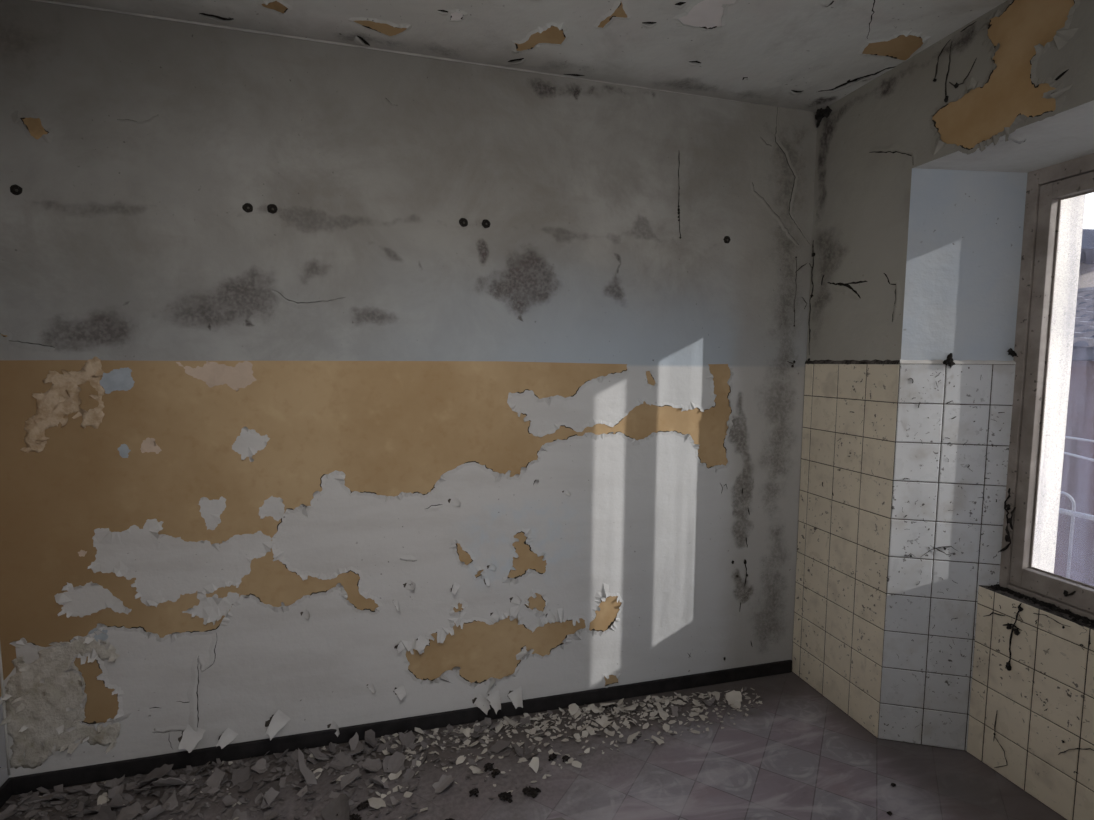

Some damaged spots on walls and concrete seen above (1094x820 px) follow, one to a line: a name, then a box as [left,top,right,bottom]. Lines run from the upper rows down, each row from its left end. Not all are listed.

peeling [349,17,412,38]
peeling [511,22,570,53]
peeling [858,30,931,62]
peeling [929,0,1081,156]
mould [490,251,551,321]
peeling [0,360,734,769]